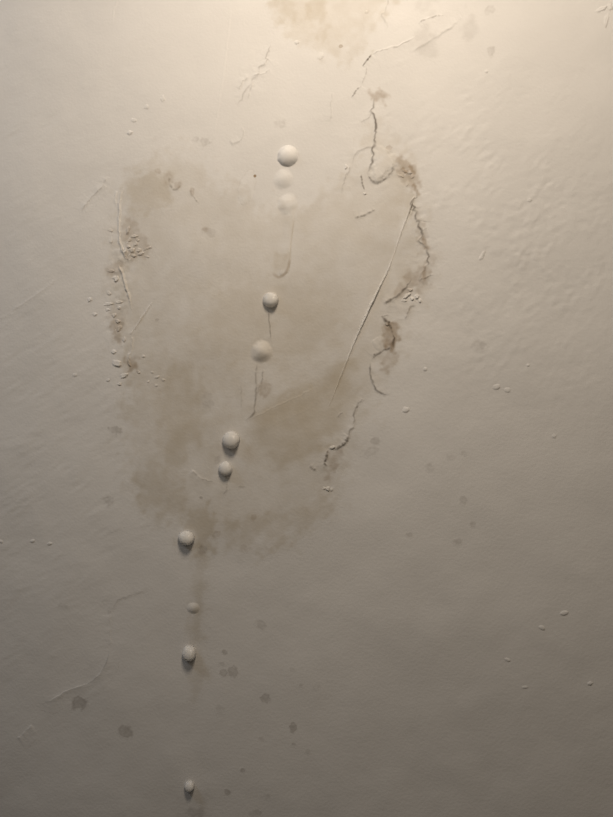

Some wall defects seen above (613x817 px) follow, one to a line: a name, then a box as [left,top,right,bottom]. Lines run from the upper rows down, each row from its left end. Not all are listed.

crack [409,183,442,290]
damp [86,120,455,710]
crack [308,313,397,475]